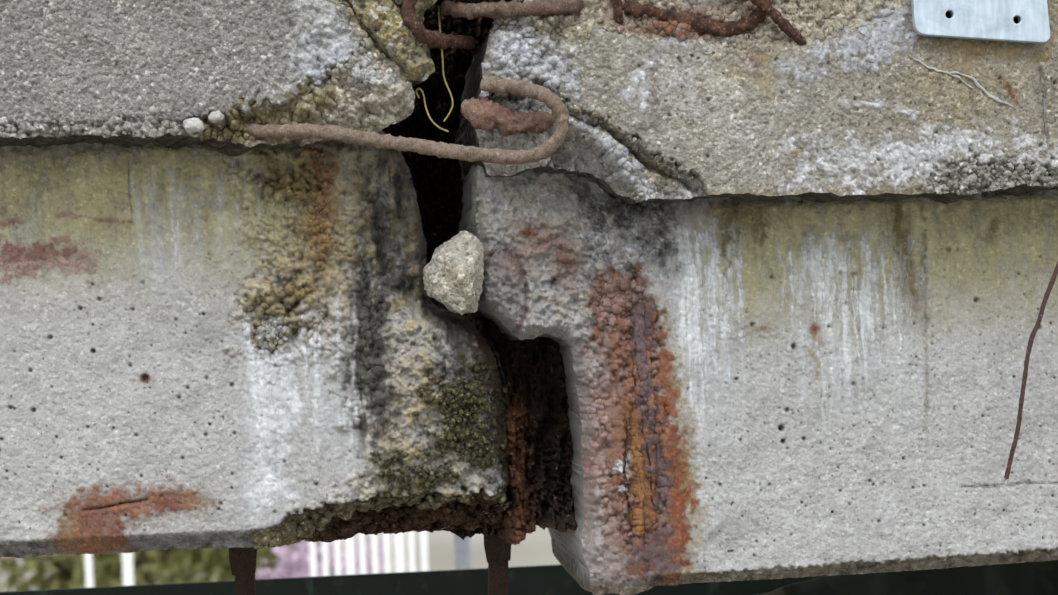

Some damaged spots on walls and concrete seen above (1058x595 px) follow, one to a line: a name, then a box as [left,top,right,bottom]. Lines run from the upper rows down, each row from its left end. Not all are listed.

leakage [482,17,579,98]
corrosion [647,15,698,35]
spalling [489,0,903,64]
spalling [475,81,706,202]
corrosion [0,220,101,284]
leakage [567,115,1058,406]
leakage [335,153,510,494]
efflorescence [245,307,323,513]
corrosion [506,385,536,544]
corrosion [54,484,214,555]
spalling [252,484,512,549]